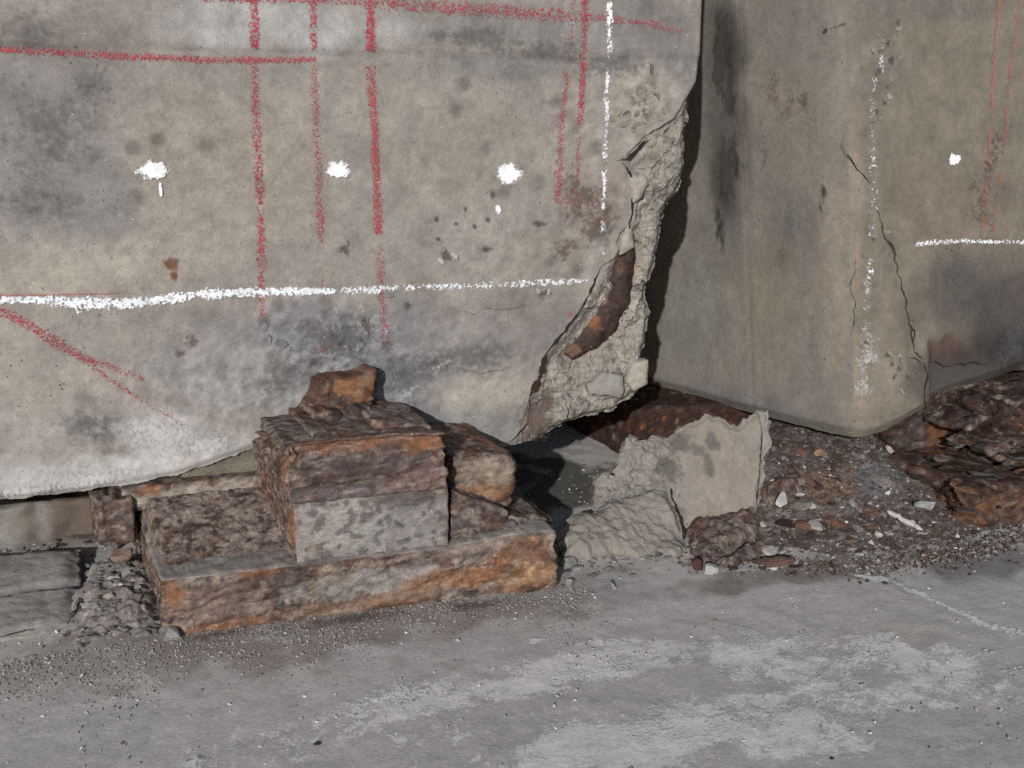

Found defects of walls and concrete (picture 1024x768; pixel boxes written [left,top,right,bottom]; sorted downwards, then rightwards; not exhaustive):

water stain [712,14,735,113]
corrosion [566,175,612,238]
spalling [514,64,694,445]
crack [841,139,987,406]